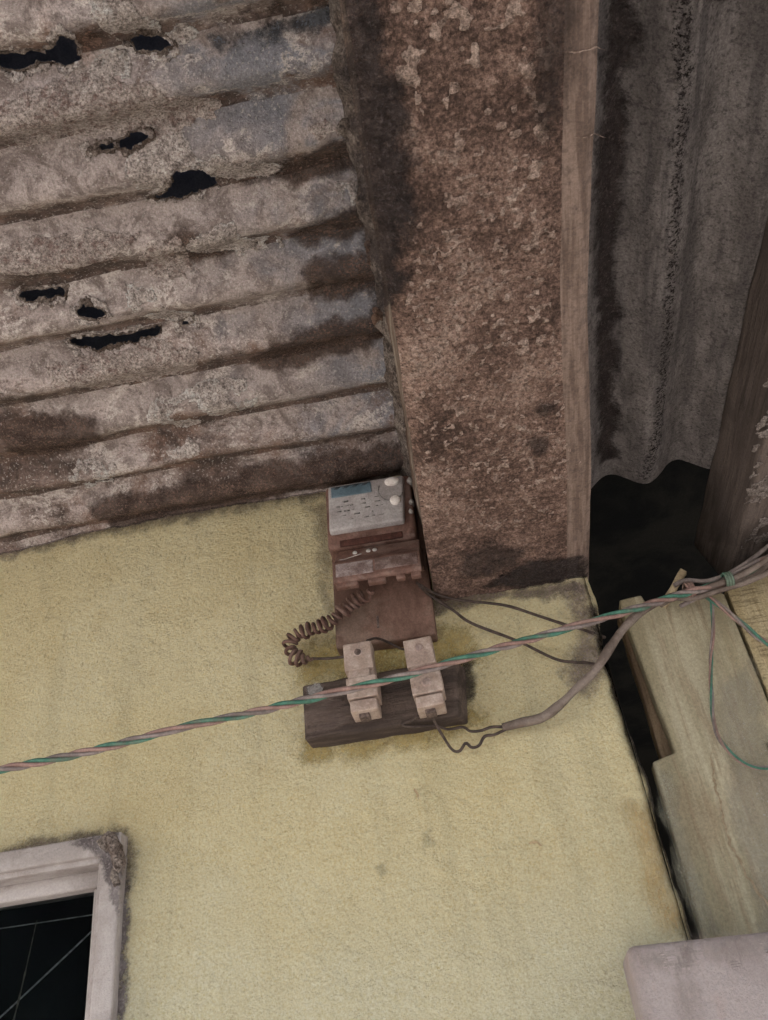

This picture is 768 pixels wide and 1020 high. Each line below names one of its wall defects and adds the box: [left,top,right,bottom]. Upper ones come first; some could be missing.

corrosion [75,29,105,54]
leakage [207,0,422,314]
peeling [744,411,768,504]
leakage [298,629,487,762]
leakage [434,540,621,710]
leakage [625,726,693,940]